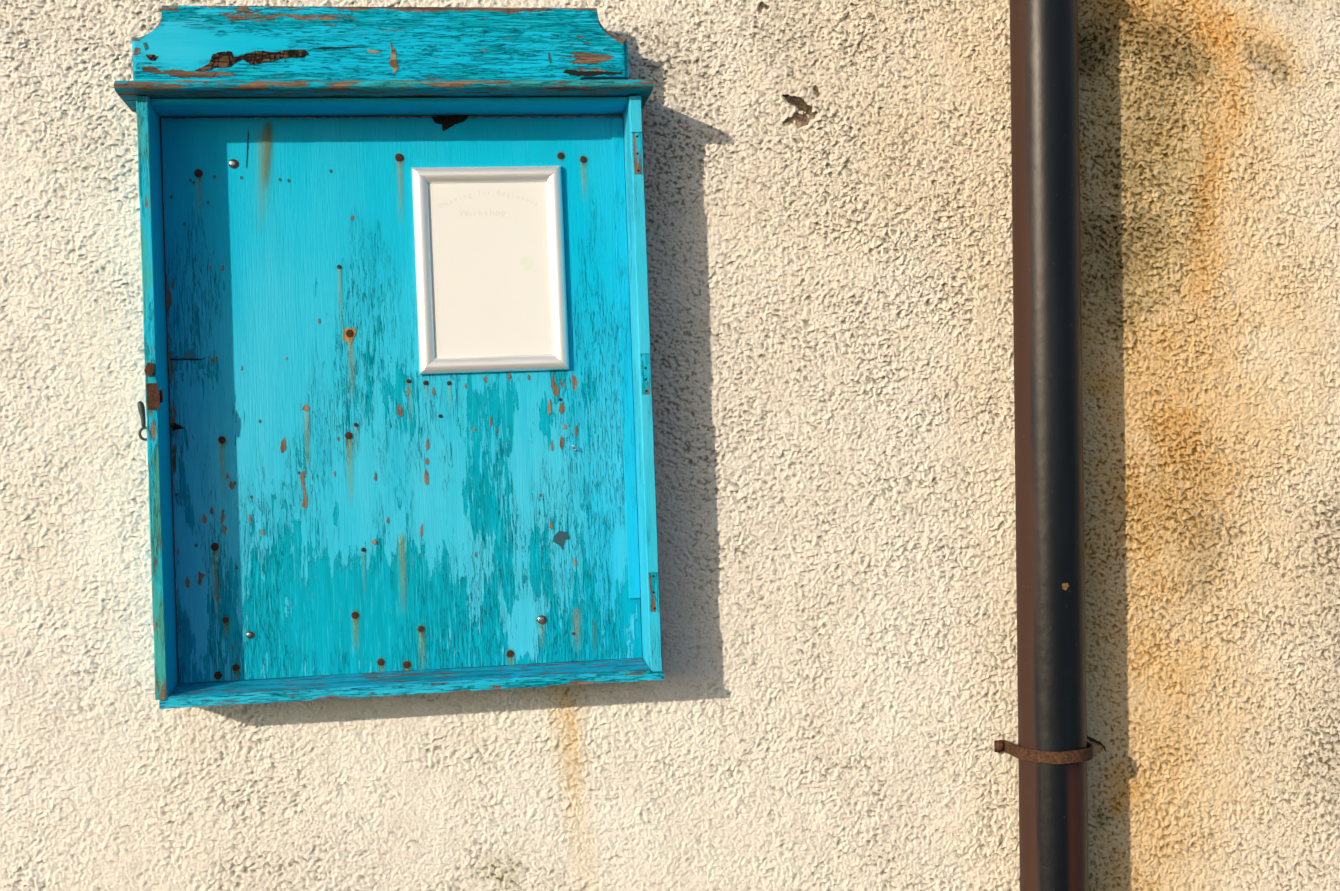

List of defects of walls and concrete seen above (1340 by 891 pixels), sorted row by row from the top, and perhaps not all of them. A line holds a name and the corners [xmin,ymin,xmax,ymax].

spalling [783,86,820,128]